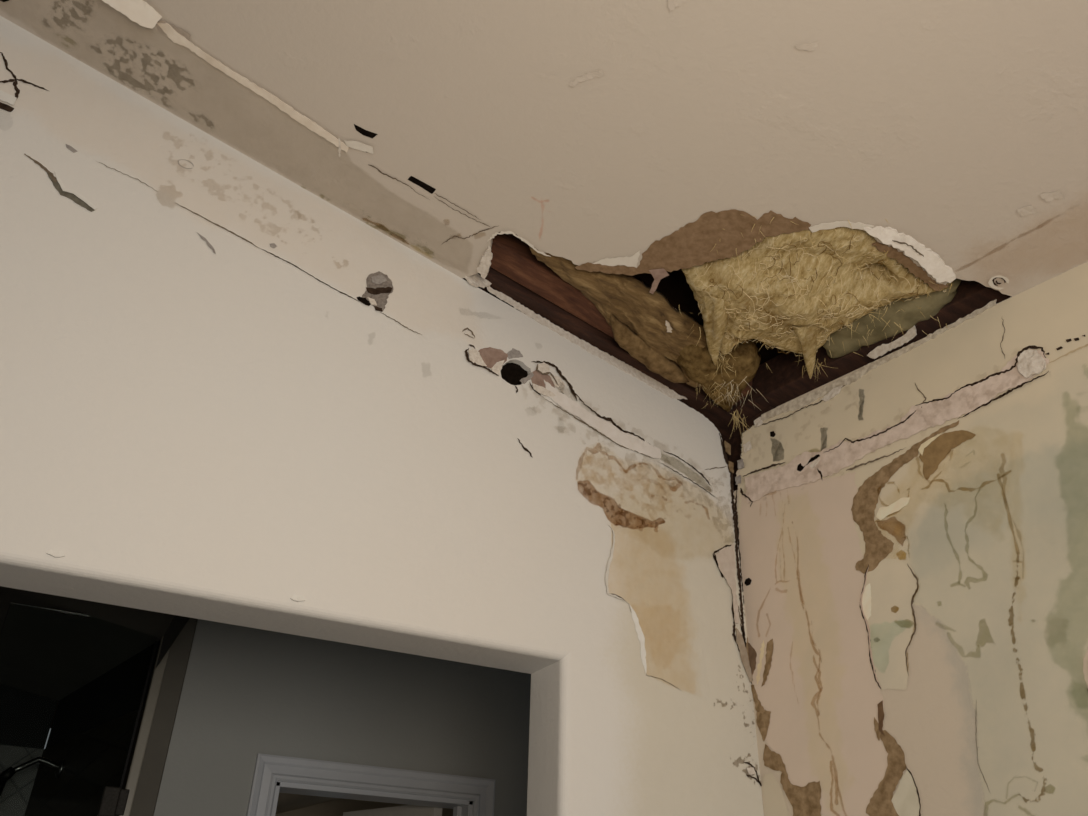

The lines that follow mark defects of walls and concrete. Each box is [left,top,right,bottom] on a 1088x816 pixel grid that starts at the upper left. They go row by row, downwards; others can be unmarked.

crack [0,52,48,98]
peeling [102,0,349,152]
crack [25,154,97,212]
flaking render [357,271,393,312]
flaking render [463,231,687,400]
flaking render [809,221,956,291]
damp [605,515,677,688]
crack [541,319,1049,684]
peeling [737,261,1088,816]